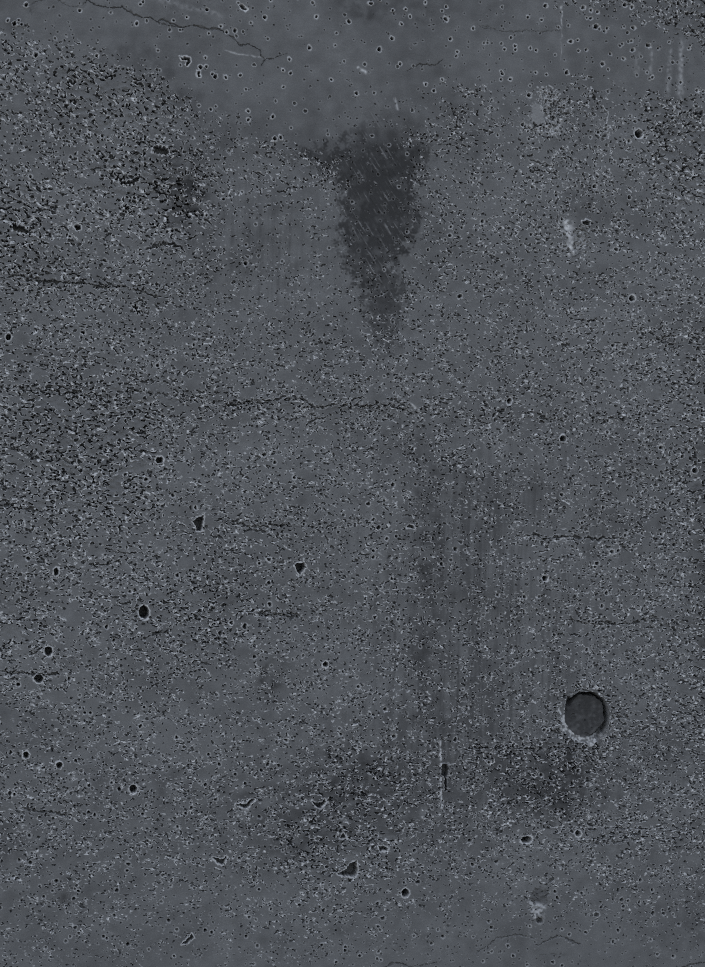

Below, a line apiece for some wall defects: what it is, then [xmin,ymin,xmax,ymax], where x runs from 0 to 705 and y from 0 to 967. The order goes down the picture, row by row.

crack [29,0,288,67]
leakage [284,101,432,360]
leakage [559,190,597,258]
crack [0,383,415,427]
crack [386,959,439,967]
crack [475,934,582,955]